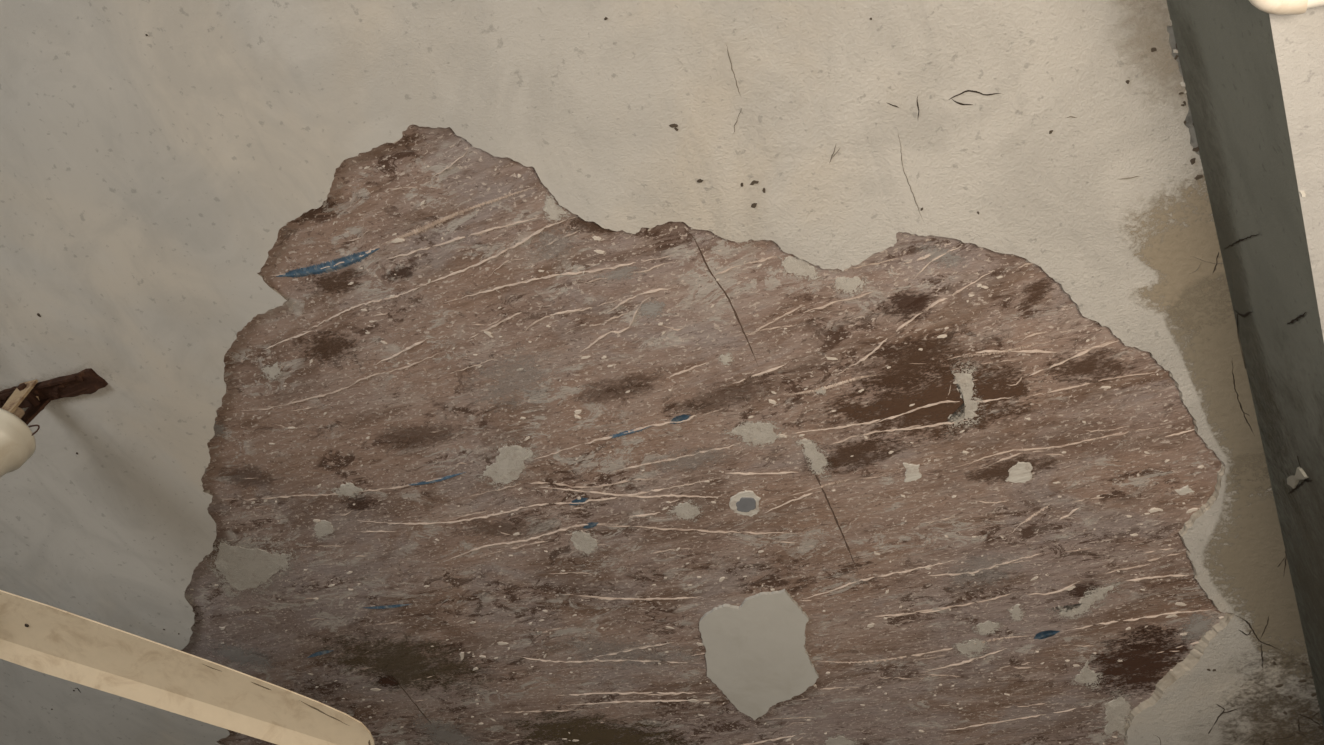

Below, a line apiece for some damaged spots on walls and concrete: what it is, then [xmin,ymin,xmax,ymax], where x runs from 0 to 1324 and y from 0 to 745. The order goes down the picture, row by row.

spalling [163,124,1235,745]
water stain [1130,175,1324,745]